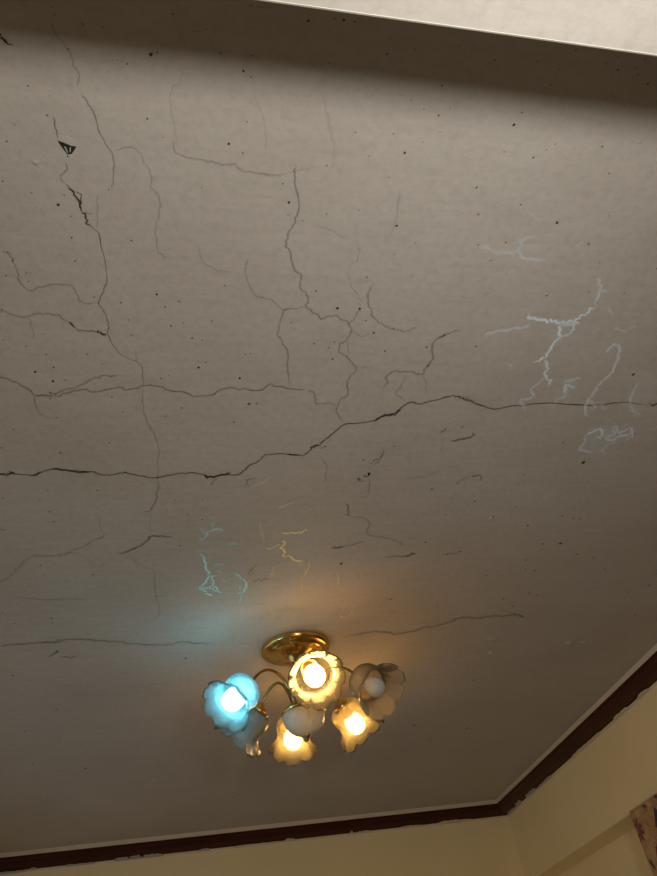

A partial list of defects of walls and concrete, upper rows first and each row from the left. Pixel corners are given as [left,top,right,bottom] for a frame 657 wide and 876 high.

peeling [54,119,77,157]
crack [69,189,89,225]
damp [526,291,601,386]
crack [0,395,657,484]